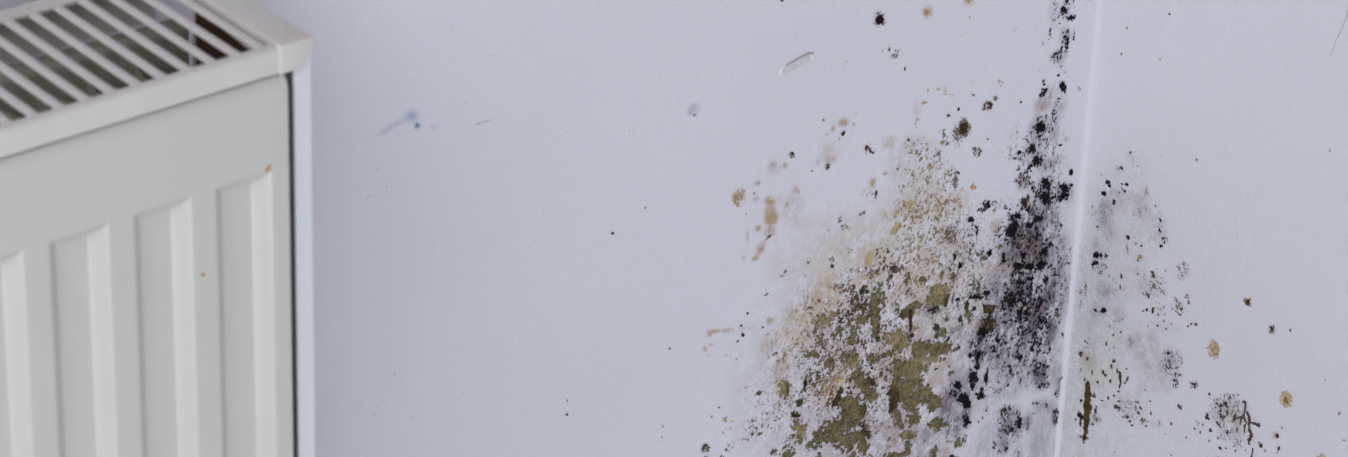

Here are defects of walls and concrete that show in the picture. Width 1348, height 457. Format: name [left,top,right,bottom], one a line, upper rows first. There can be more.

leakage [702,0,1197,457]
leakage [1206,340,1220,358]
leakage [1163,352,1283,457]
leakage [1280,391,1292,408]